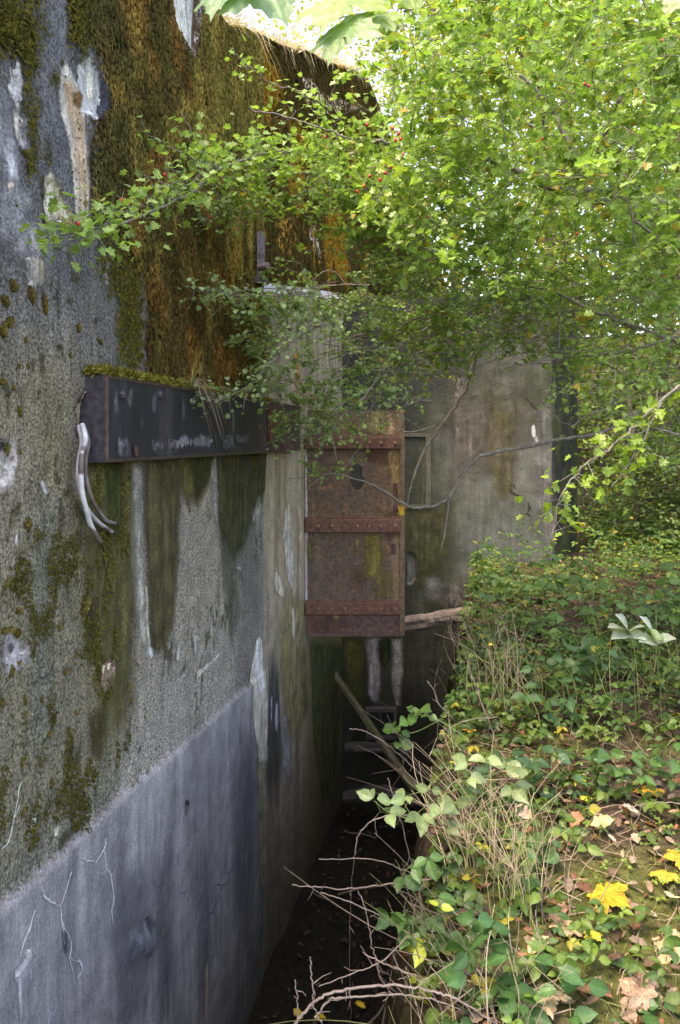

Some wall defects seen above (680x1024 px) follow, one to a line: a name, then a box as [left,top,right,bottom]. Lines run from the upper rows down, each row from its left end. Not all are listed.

spalling [77,58,111,122]
damp [455,378,513,466]
spalling [0,438,18,488]
damp [104,462,155,658]
damp [190,456,241,636]
damp [252,491,264,535]
damp [425,577,466,607]
damp [531,409,554,554]
damp [368,638,402,705]
damp [91,705,106,758]
crack [20,839,115,980]